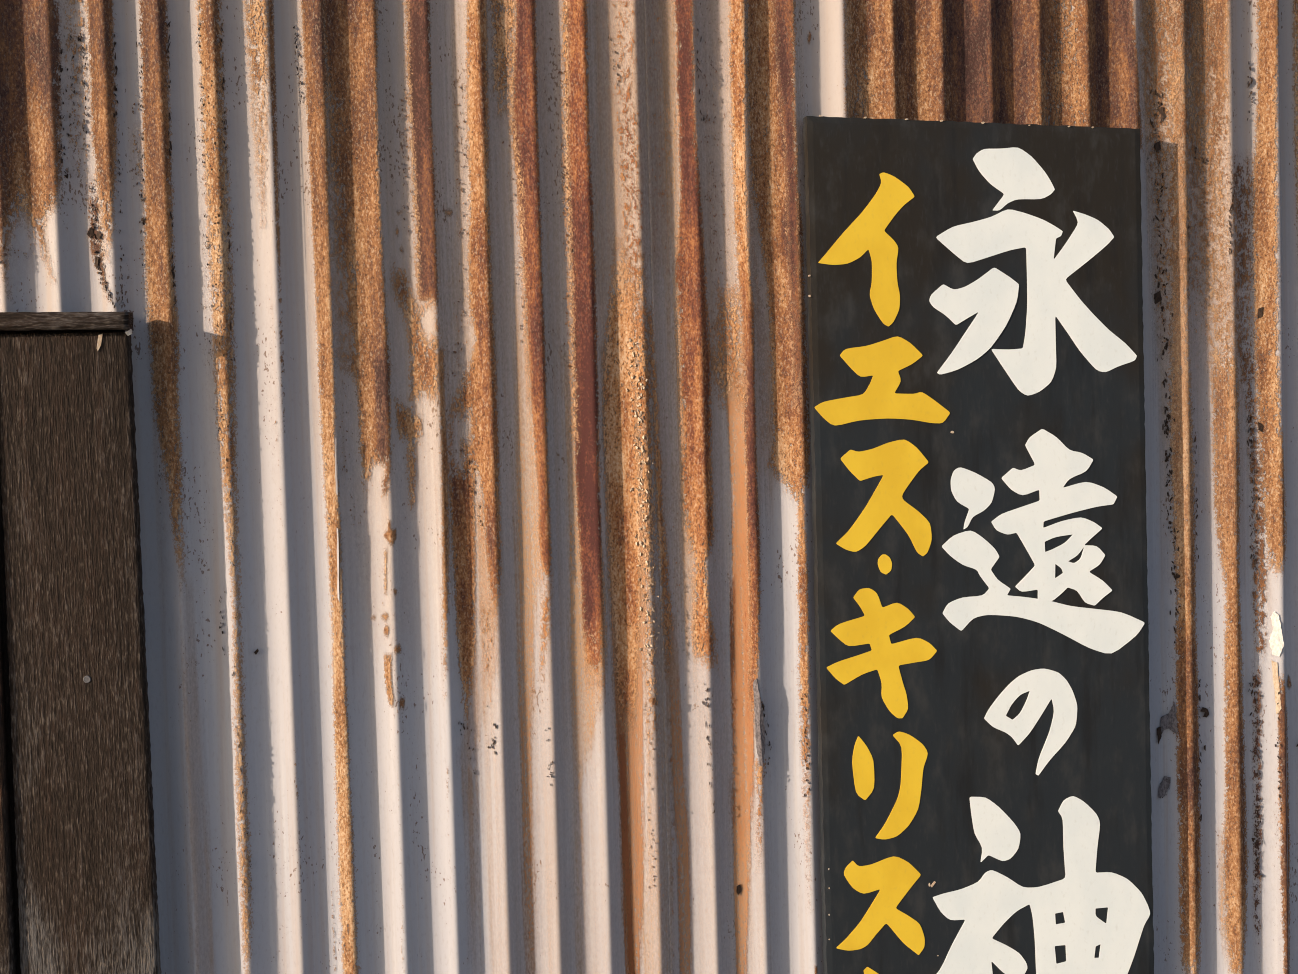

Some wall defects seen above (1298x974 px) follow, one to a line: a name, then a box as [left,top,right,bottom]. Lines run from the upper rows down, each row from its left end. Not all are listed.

corrosion [0,0,68,279]
corrosion [85,0,188,577]
corrosion [195,0,254,974]
corrosion [241,0,285,441]
corrosion [293,0,812,974]
corrosion [837,0,1144,152]
corrosion [1157,0,1298,974]